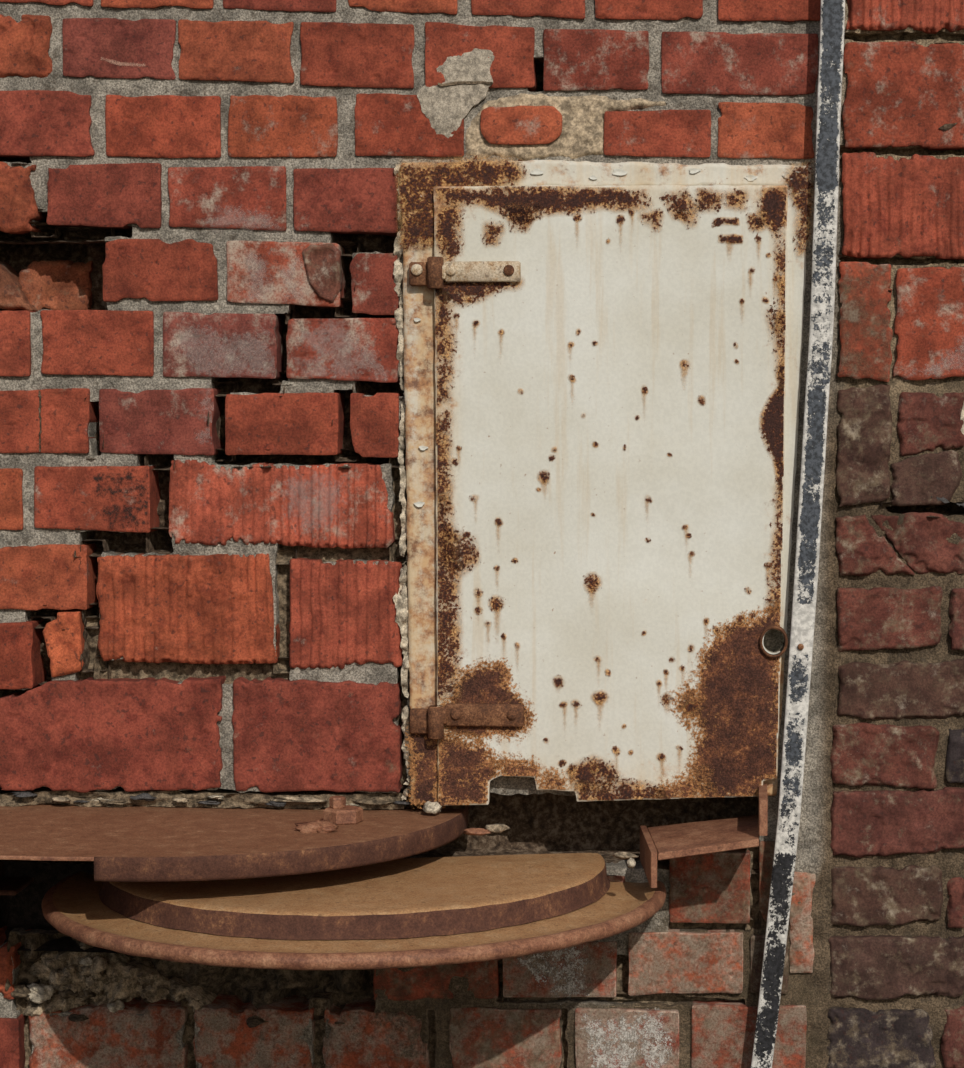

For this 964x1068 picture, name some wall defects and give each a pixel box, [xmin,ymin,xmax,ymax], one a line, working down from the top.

spalling [0,227,117,312]
crack [0,225,407,698]
corrosion [394,154,815,809]
crack [880,500,964,517]
crack [396,656,411,799]
spalling [11,942,218,1017]